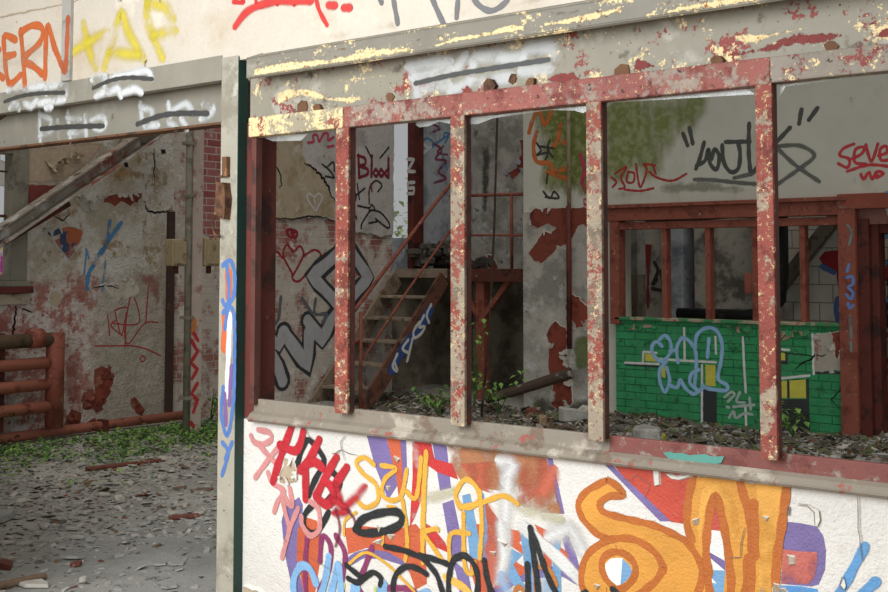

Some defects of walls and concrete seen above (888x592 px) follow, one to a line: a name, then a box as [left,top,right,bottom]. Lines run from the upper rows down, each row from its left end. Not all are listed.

peeling [544,6,621,26]
peeling [667,0,752,13]
peeling [437,25,524,46]
peeling [728,27,842,57]
peeling [634,59,654,71]
peeling [528,206,587,264]
peeling [545,294,588,410]
peeling [64,365,115,425]
peeling [131,397,145,416]
flaking render [243,583,265,592]